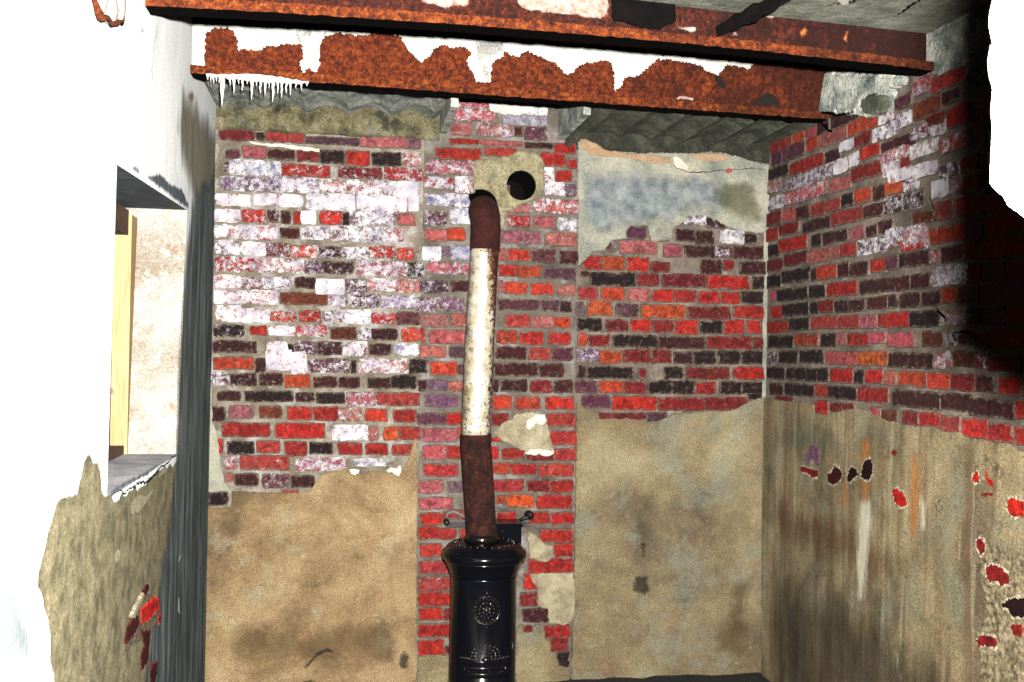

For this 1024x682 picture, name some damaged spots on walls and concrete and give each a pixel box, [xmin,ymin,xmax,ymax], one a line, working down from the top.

water stain [509,137,859,257]
rust [756,93,779,106]
flaking render [574,50,1024,451]
water stain [857,224,969,287]
water stain [872,104,998,215]
water stain [965,45,991,91]
flaking render [209,129,428,508]
water stain [146,96,475,682]
flaking render [800,445,874,487]
peeling [38,455,177,682]
water stain [857,500,875,598]
flaking render [974,535,1024,682]